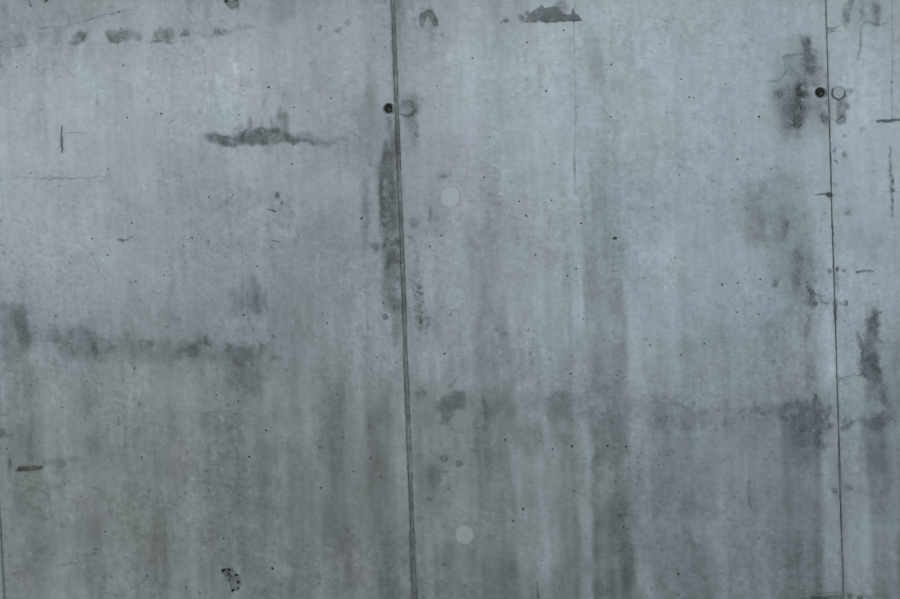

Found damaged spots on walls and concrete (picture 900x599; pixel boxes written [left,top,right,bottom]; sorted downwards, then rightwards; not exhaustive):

water stain [209,128,299,146]
water stain [858,337,886,403]